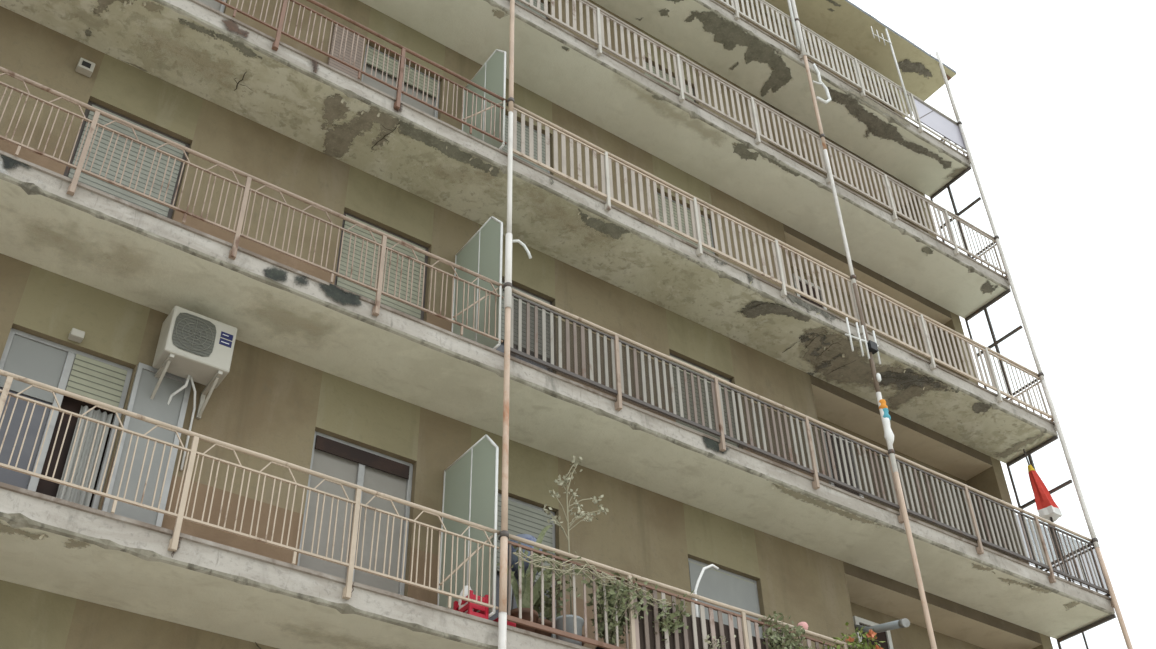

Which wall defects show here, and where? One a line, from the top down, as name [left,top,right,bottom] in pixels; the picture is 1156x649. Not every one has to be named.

peeling [85,0,163,36]
peeling [177,18,262,59]
peeling [659,0,793,97]
spalling [898,59,951,80]
peeling [321,94,500,177]
spalling [828,87,952,169]
spalling [737,294,845,376]
spalling [867,367,958,393]
spalling [973,400,991,414]